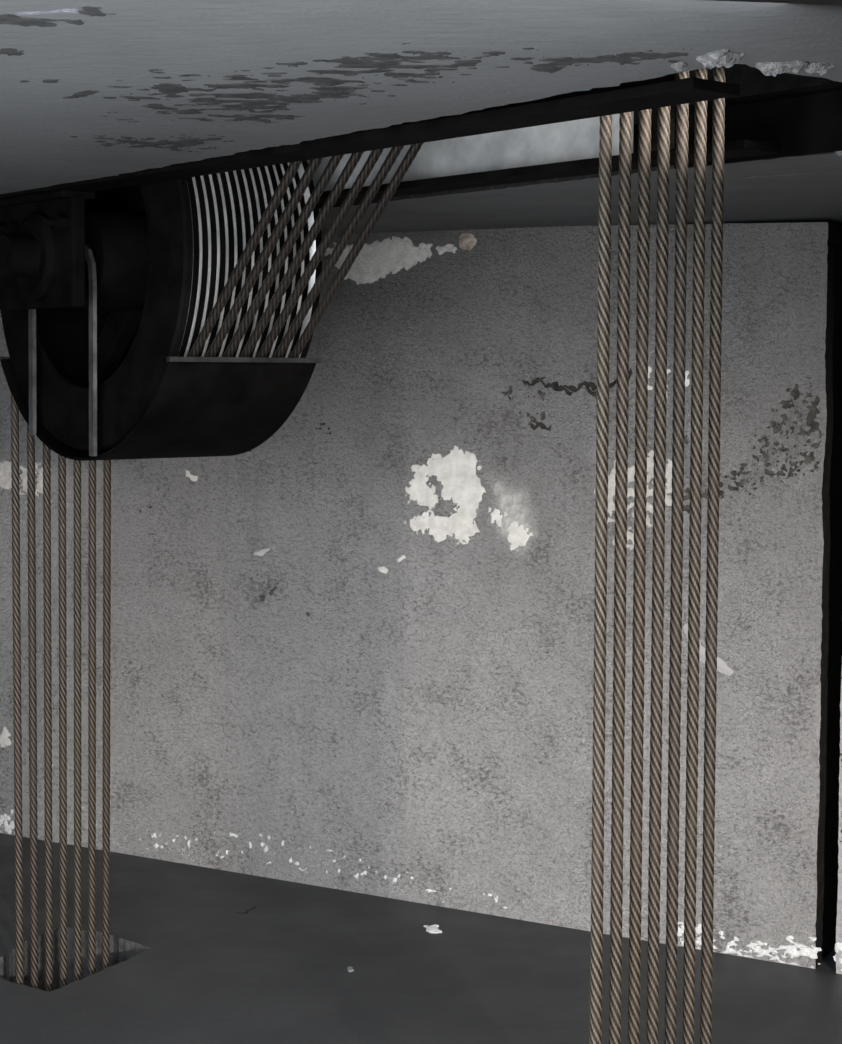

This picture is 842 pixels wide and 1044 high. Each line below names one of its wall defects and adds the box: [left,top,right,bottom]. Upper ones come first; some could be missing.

peeling [324,236,457,285]
peeling [0,460,43,498]
peeling [404,445,534,551]
peeling [592,450,688,550]
spalling [702,377,821,499]